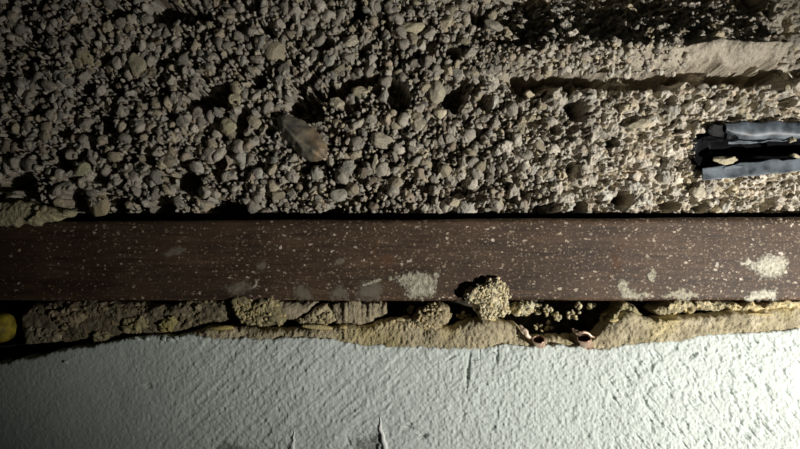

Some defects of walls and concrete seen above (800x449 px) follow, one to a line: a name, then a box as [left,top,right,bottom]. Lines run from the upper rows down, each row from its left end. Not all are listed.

water stain [740,253,789,277]
water stain [358,270,441,301]
peeling [192,307,800,350]